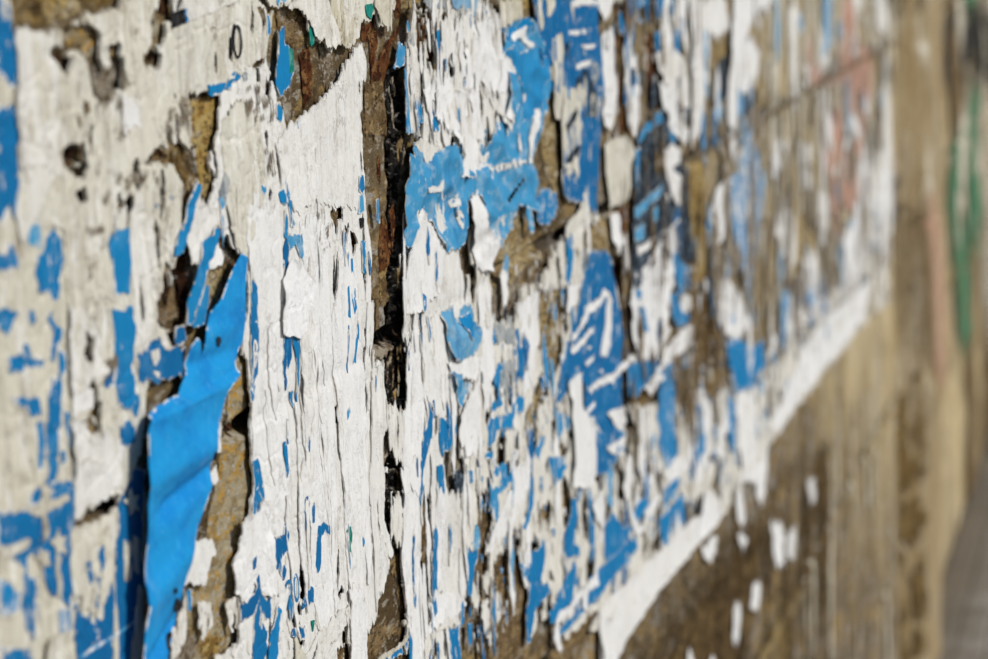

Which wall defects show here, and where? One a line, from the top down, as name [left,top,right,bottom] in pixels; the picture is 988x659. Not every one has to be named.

spalling [394,2,432,69]
spalling [540,92,559,197]
spalling [206,268,222,299]
crack [363,67,406,543]
spalling [489,216,544,320]
spalling [583,216,610,254]
spalling [524,288,565,427]
spalling [168,355,251,659]
spalling [443,447,464,491]
spalling [474,493,526,659]
spalling [544,611,595,659]